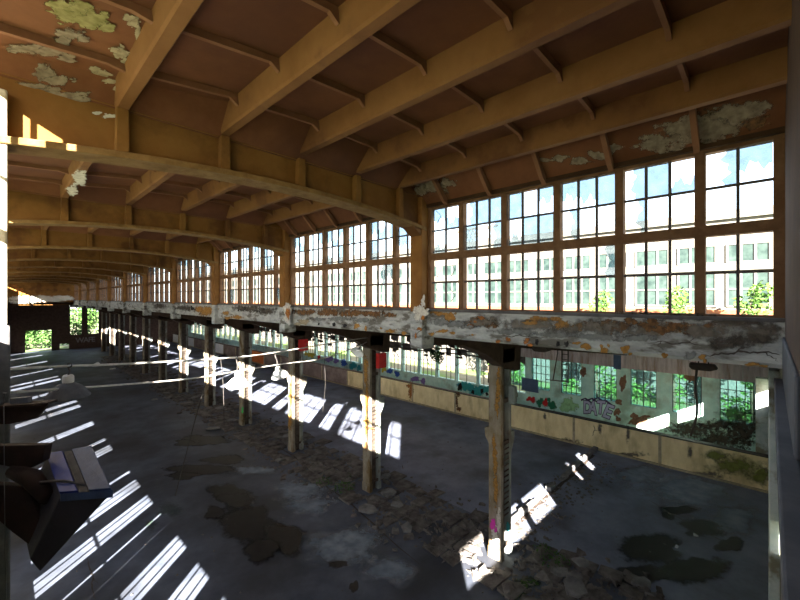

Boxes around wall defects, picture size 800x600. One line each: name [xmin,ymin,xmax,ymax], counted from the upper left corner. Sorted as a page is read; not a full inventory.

peeling [123,14,141,40]
peeling [6,0,116,102]
peeling [108,44,130,64]
peeling [539,100,773,165]
peeling [66,170,87,196]
spalling [235,303,399,328]
peeling [413,295,429,321]
spalling [522,316,714,336]
crack [649,338,779,361]